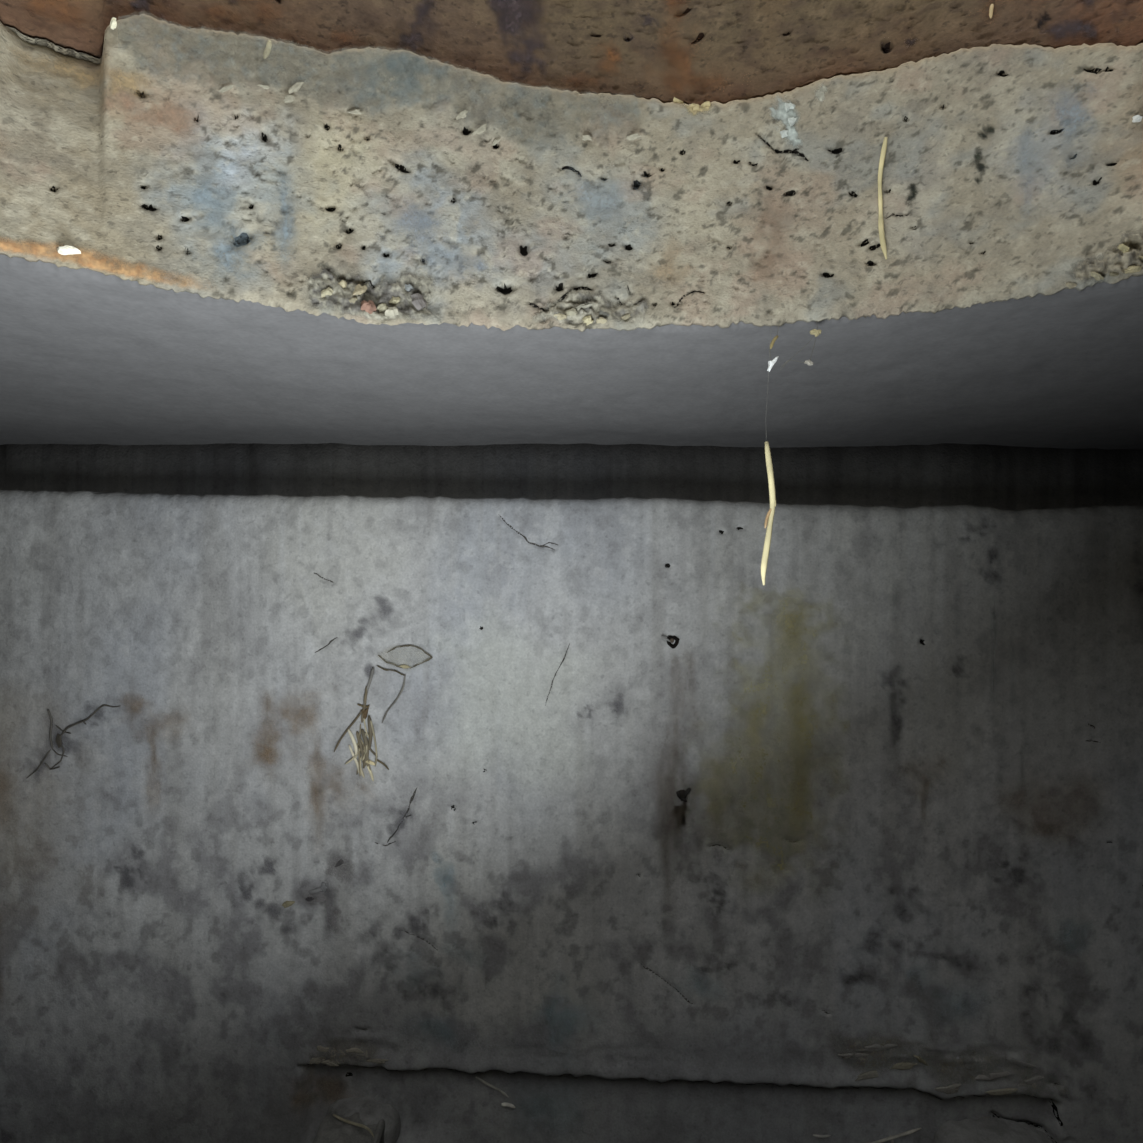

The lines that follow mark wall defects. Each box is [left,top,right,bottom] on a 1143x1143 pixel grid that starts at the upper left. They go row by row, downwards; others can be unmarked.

spalling [308,259,439,320]
spalling [534,260,675,326]
spalling [1065,233,1143,289]